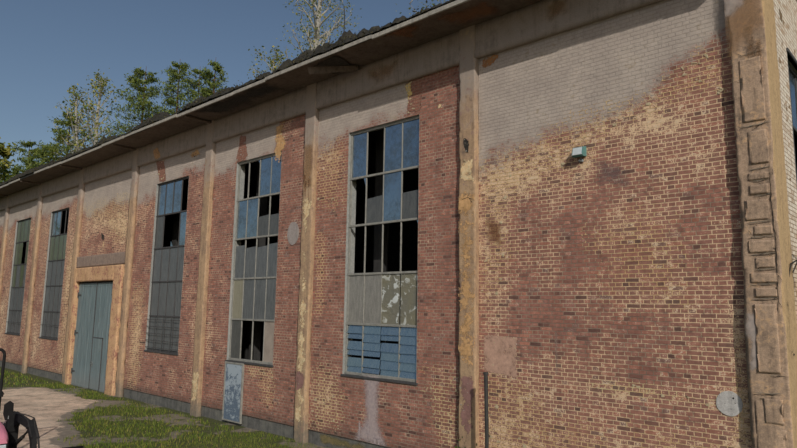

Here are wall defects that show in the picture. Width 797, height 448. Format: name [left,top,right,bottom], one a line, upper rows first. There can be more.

peeling [295,133,350,433]
water stain [320,377,384,448]
peeling [418,46,734,448]
peeling [625,313,757,448]